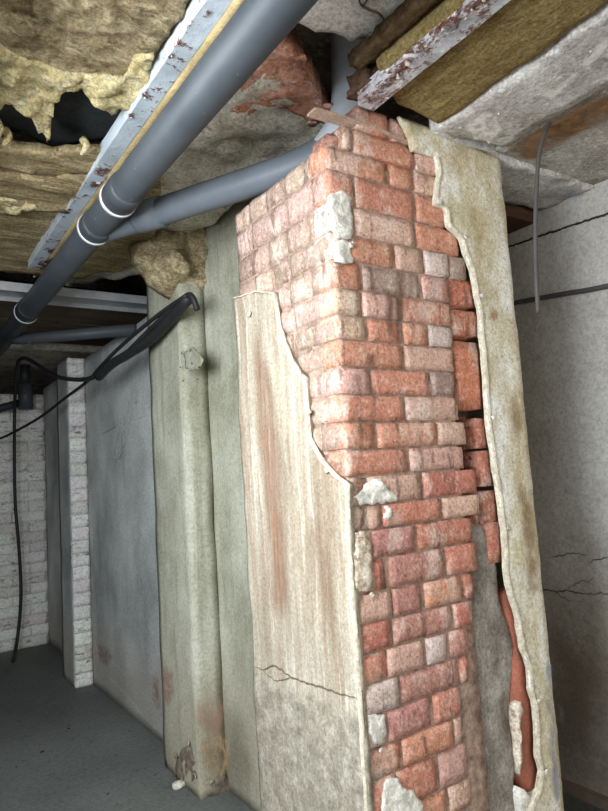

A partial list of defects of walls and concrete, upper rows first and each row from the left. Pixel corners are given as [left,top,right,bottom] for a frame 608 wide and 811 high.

spalling [231,28,338,153]
corrosion [346,0,482,101]
peeling [459,112,502,144]
spalling [432,155,549,811]
spalling [232,290,369,811]
crack [543,553,608,602]
crack [255,664,355,698]